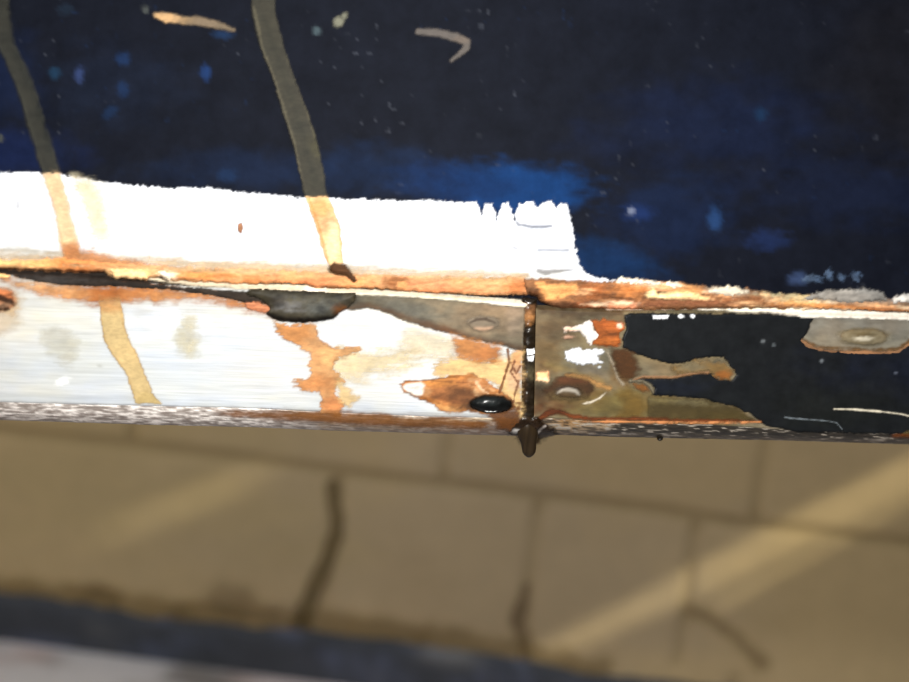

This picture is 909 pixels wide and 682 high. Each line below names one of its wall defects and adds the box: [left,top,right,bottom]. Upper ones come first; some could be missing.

water stain [0,0,144,264]
water stain [251,0,357,282]
corrosion [0,258,331,404]
corrosion [225,323,525,431]
peeling [347,295,535,361]
corrosion [537,318,762,424]
peeling [801,339,909,354]
crack [291,480,344,629]